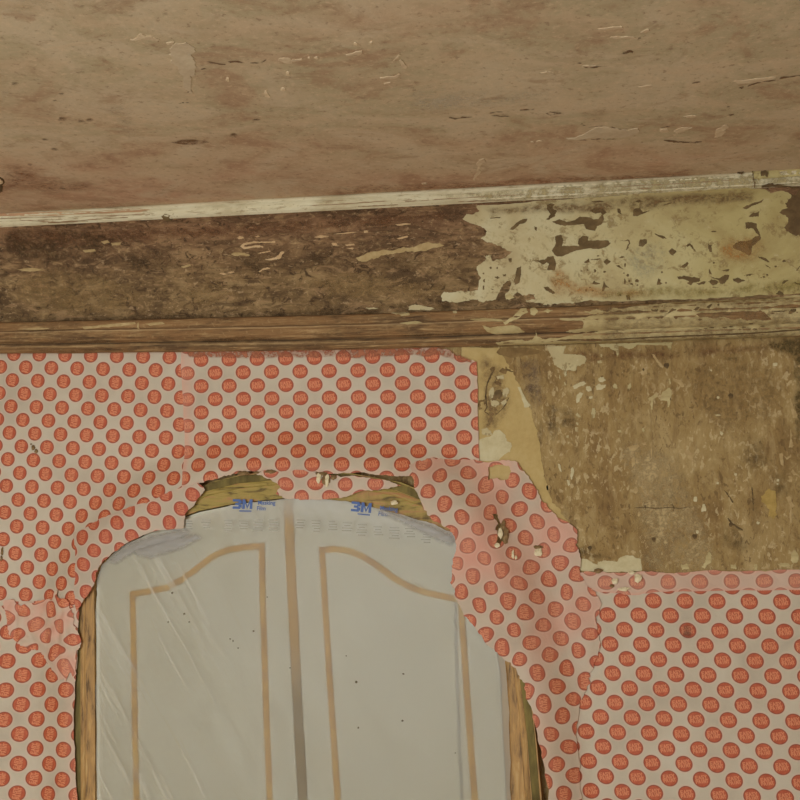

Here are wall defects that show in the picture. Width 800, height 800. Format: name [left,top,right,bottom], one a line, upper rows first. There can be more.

peeling [441,169,800,524]
peeling [493,514,508,544]
peeling [580,545,642,572]